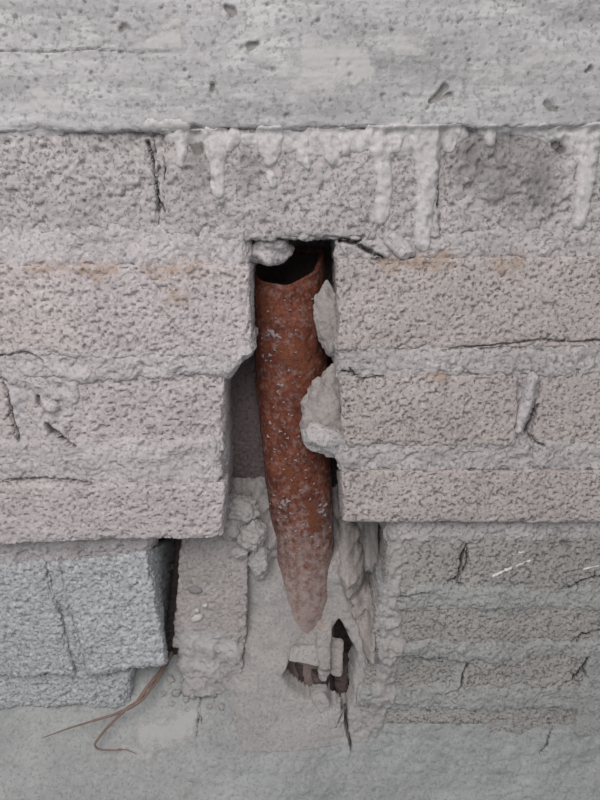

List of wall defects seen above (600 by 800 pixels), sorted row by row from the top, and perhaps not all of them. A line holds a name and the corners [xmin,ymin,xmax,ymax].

crack [146,141,166,212]
peeling [289,643,330,686]
crack [568,629,600,682]
crack [337,703,351,750]